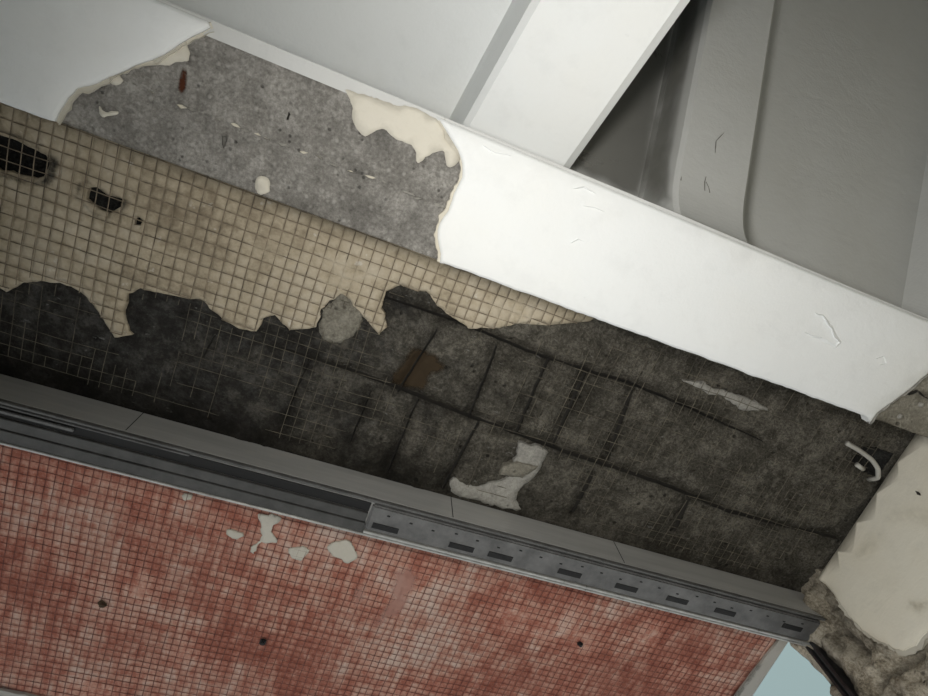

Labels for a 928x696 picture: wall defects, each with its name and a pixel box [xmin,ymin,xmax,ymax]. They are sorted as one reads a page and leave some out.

spalling [0,135,58,183]
spalling [57,22,462,264]
spalling [0,281,928,696]